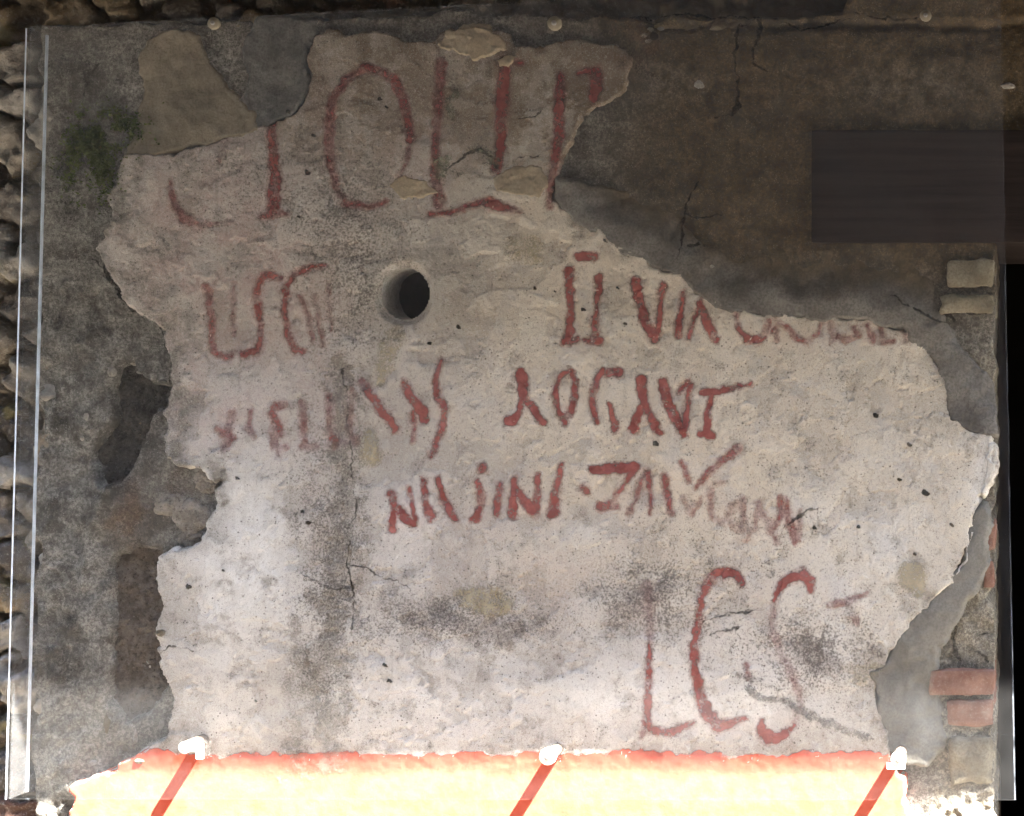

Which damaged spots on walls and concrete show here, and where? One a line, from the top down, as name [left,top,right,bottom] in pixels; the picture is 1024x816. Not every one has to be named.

crack [630,13,767,118]
crack [678,182,721,247]
spalling [98,362,172,484]
crack [303,368,407,630]
spalling [114,547,169,764]